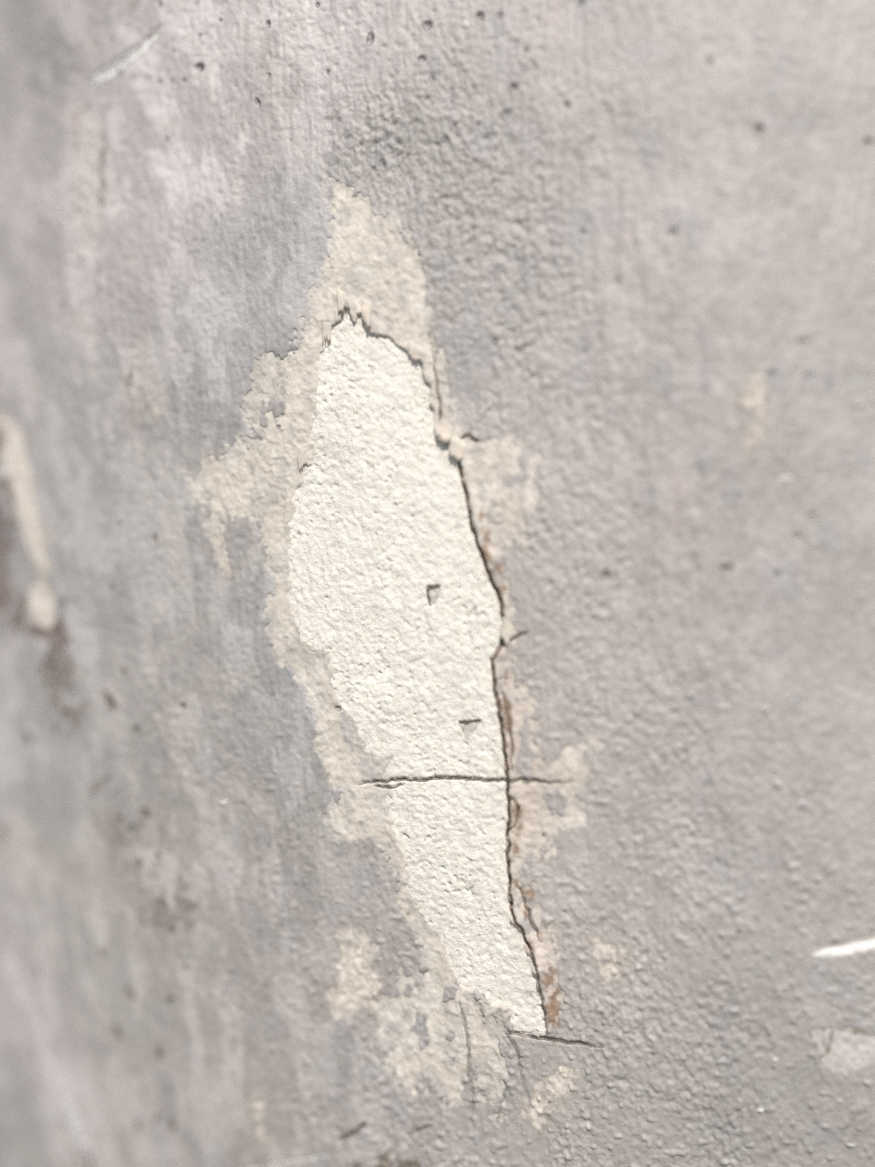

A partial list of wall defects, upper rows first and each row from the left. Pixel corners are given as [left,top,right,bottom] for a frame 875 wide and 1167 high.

corrosion [0,415,57,629]
peeling [183,177,605,1135]
crack [357,345,604,1124]